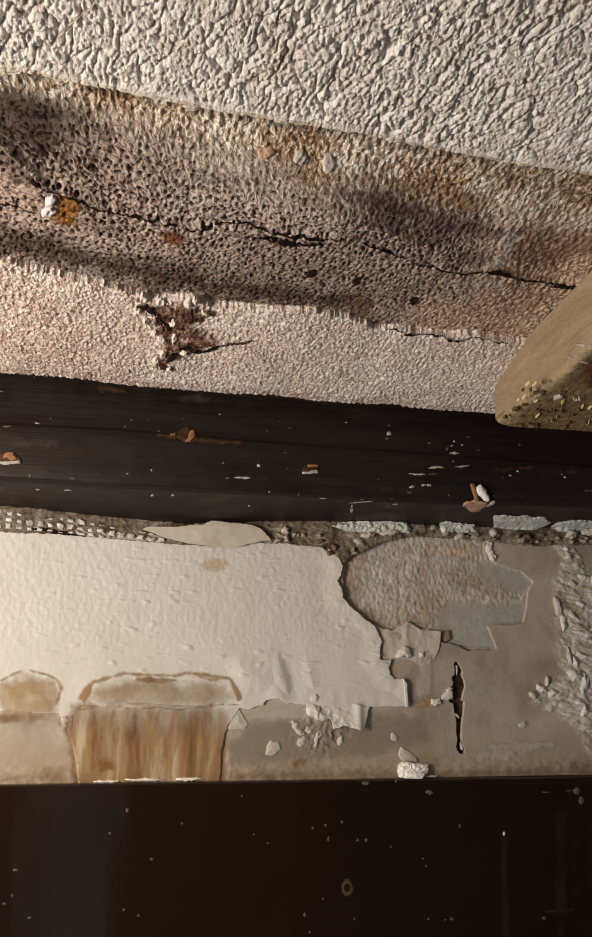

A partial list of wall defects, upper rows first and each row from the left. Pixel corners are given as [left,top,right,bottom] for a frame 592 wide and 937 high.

crack [27,178,338,248]
leakage [0,227,374,319]
spalling [0,66,592,373]
leakage [335,188,592,267]
crack [361,243,576,290]
peeling [463,483,495,512]
peeling [0,521,532,752]
leakage [0,670,62,721]
leakage [66,672,424,783]
peeling [265,740,282,756]